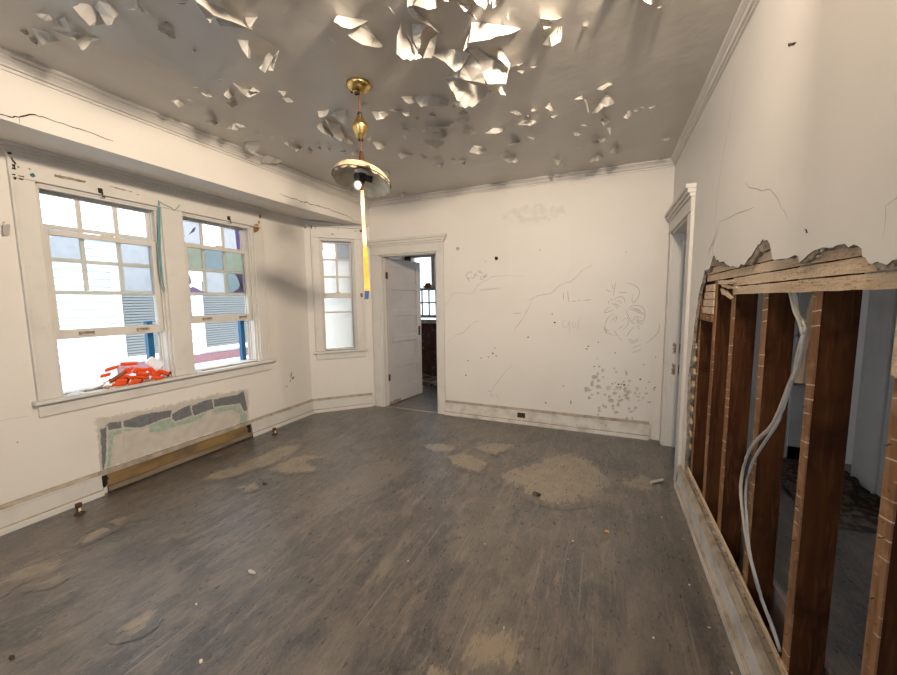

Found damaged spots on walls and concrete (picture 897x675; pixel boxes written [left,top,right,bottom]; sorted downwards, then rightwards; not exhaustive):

peeling [73,0,151,26]
peeling [174,0,282,73]
peeling [334,16,384,47]
peeling [538,17,562,47]
peeling [360,0,537,121]
peeling [218,78,260,108]
crack [0,114,112,143]
peeling [500,102,558,164]
peeling [573,82,621,162]
crack [708,182,788,254]
spalling [743,240,771,266]
spalling [798,244,855,264]